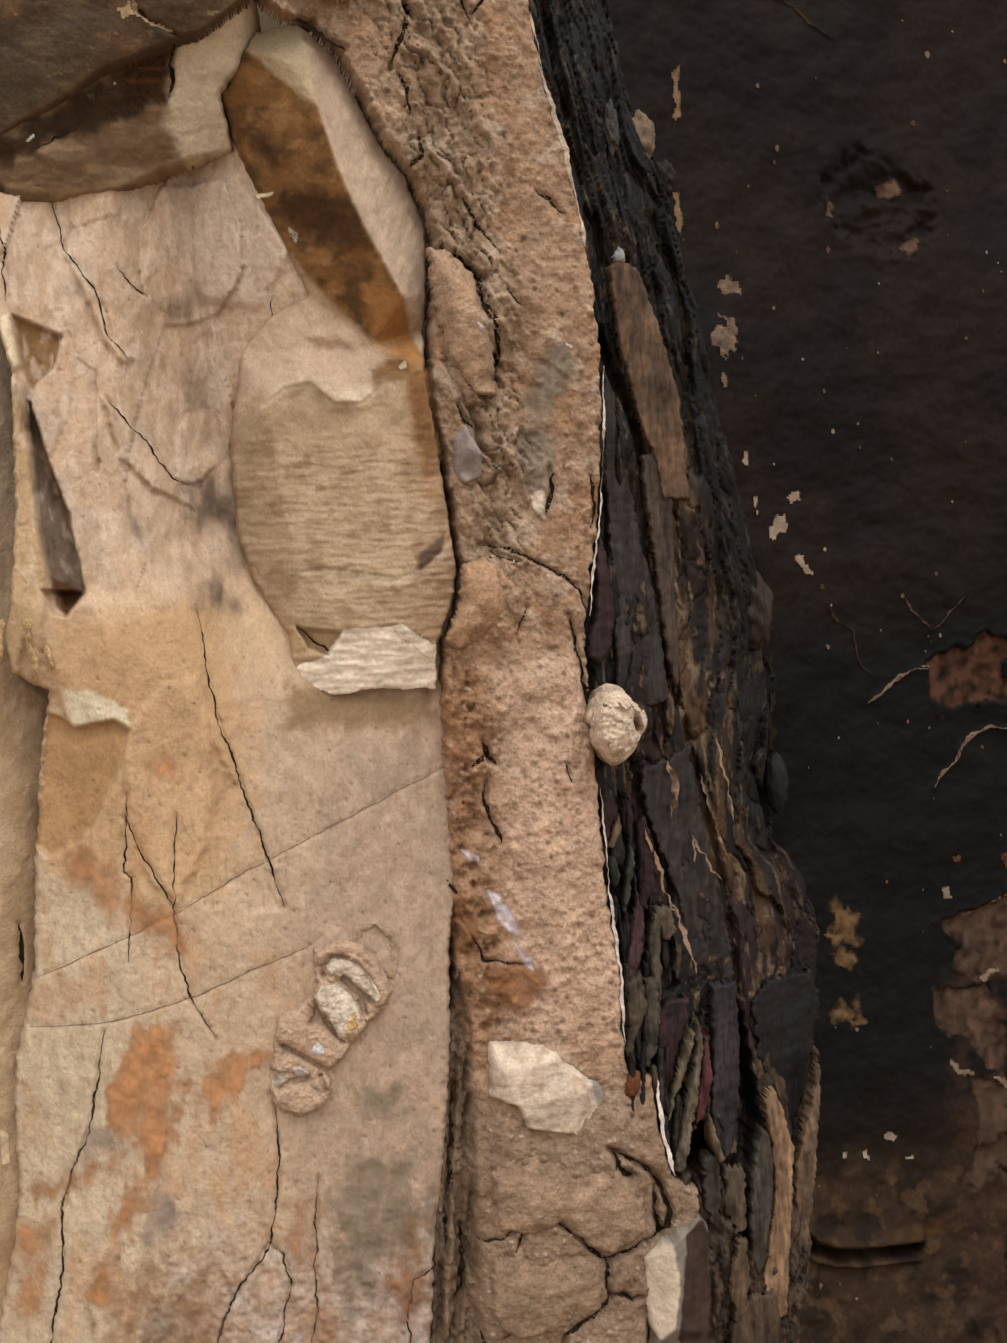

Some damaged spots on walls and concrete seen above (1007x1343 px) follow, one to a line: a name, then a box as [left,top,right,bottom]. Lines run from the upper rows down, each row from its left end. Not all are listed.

peeling [924,631,1007,708]
crack [18,616,502,1343]
peeling [933,894,1007,1189]
crack [406,1082,523,1343]
crack [559,1149,673,1343]